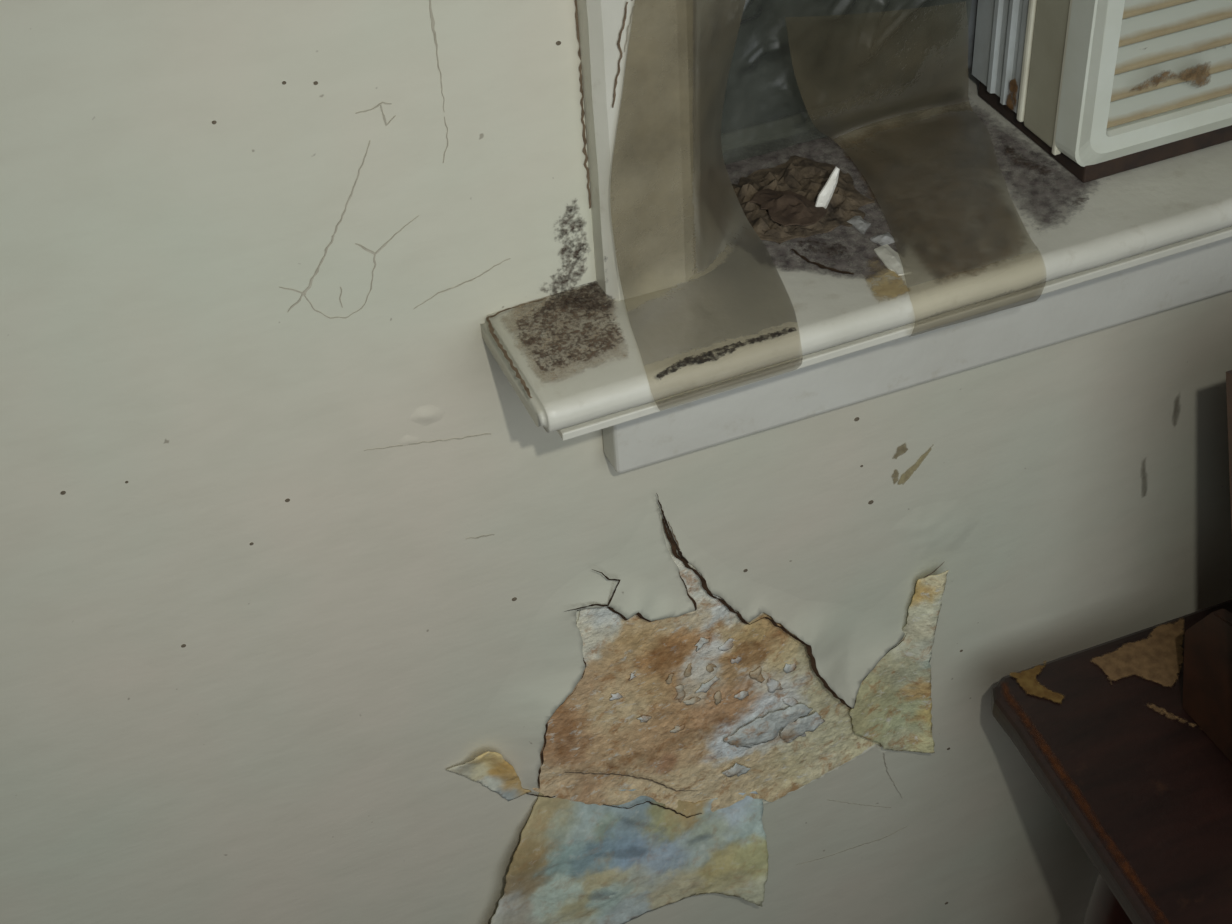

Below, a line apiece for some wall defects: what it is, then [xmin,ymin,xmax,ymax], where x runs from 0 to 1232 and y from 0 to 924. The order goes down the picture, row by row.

crack [429,0,448,163]
crack [414,258,511,309]
water stain [512,201,626,380]
water stain [705,127,904,278]
water stain [943,97,1096,224]
peeling [446,493,949,924]